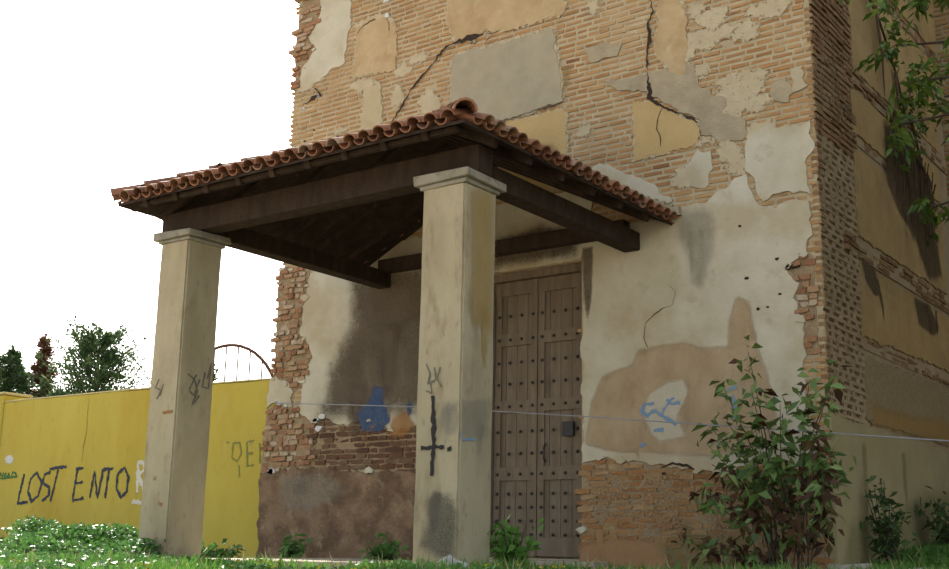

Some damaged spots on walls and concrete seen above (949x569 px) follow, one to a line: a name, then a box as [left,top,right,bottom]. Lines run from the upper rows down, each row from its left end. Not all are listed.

spalling [288,0,321,92]
crack [392,28,493,121]
crack [646,0,697,146]
spalling [270,267,312,392]
spalling [260,402,416,474]
spalling [575,455,835,569]